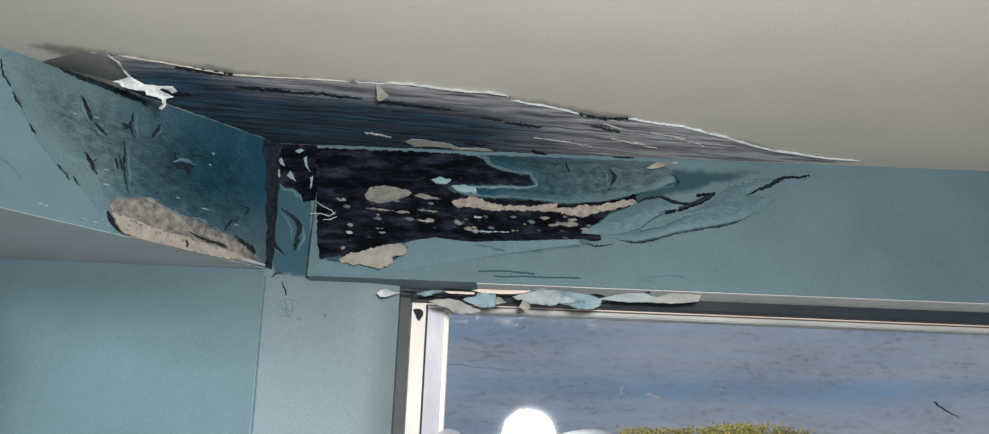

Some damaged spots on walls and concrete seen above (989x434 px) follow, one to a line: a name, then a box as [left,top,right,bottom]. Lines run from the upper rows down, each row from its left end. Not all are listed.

crack [0,59,80,186]
peeling [77,140,98,176]
peeling [81,95,108,137]
crack [59,68,148,191]
peeling [90,52,859,276]
peeling [377,288,701,314]